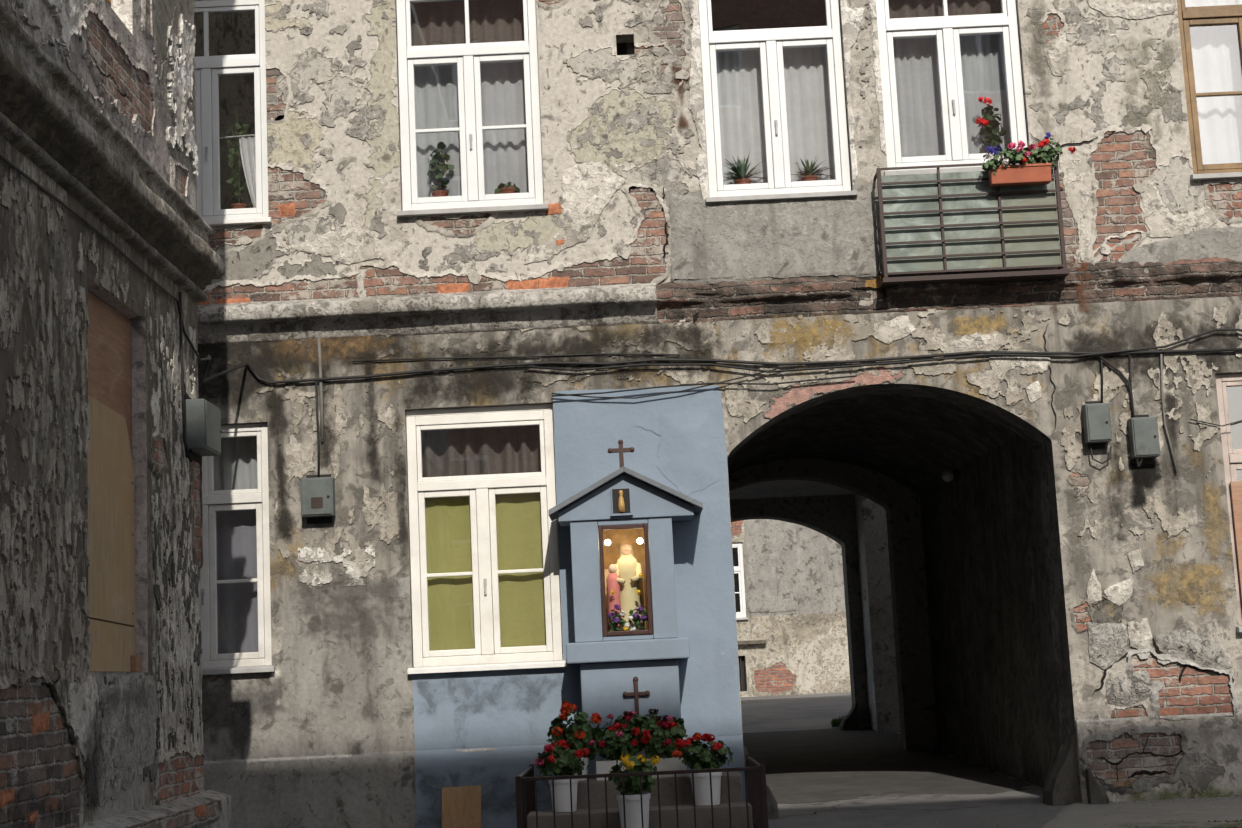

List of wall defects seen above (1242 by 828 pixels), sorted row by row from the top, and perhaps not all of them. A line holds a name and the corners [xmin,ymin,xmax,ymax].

flaking render [0,0,199,201]
flaking render [197,0,698,305]
flaking render [1026,0,1242,268]
leakage [282,335,391,479]
leakage [954,316,1005,334]
peeling [1147,311,1218,452]
flaking render [0,168,222,828]
leakage [398,456,408,540]
leakage [1151,486,1227,615]
flaking render [1068,490,1239,795]
crack [1092,638,1234,696]
crack [1095,735,1192,781]